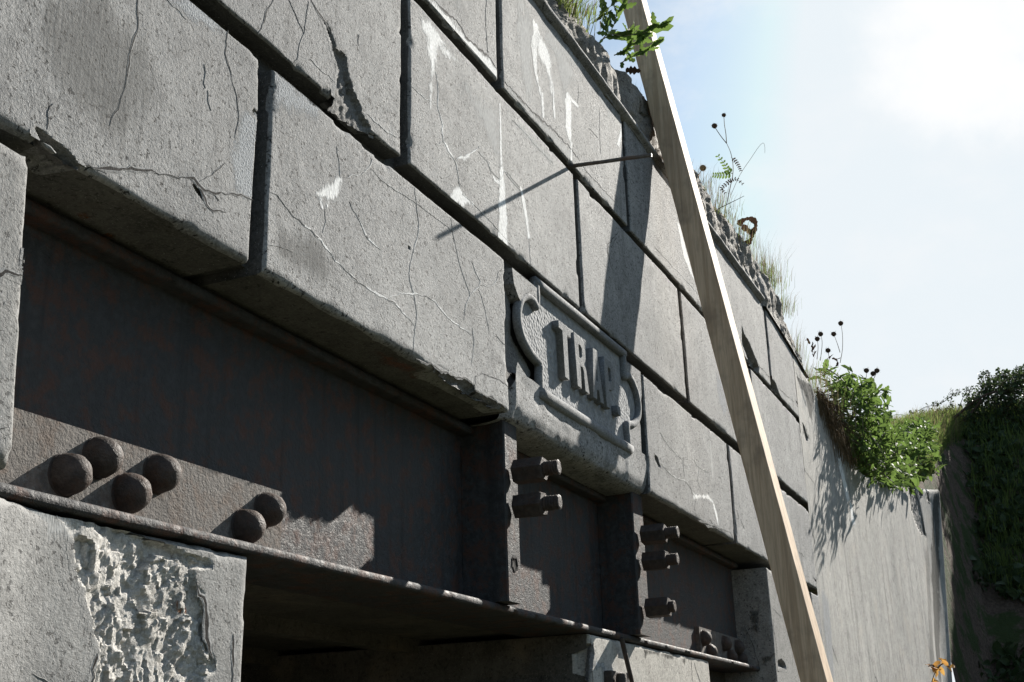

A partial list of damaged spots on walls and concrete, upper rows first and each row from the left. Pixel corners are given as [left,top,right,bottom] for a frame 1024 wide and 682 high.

crack [110,0,140,124]
crack [203,30,239,135]
spalling [274,10,376,139]
leakage [422,20,456,109]
leakage [509,0,579,161]
crack [80,74,531,408]
leakage [520,186,530,239]
spalling [54,515,221,682]